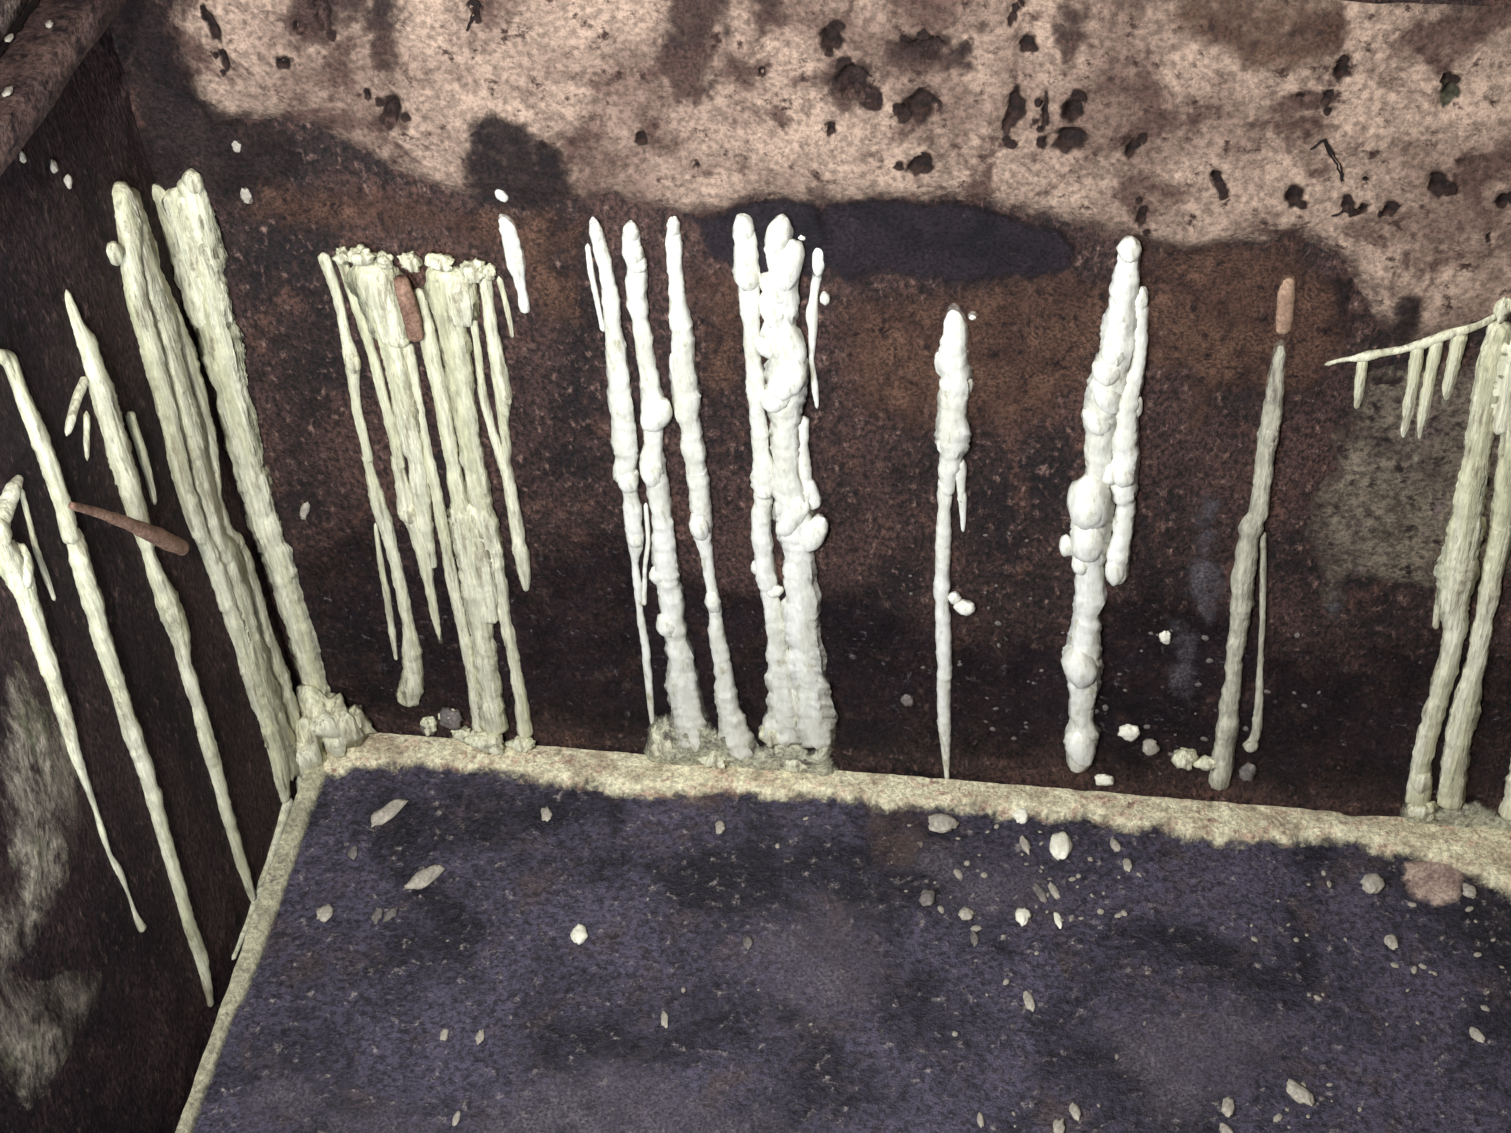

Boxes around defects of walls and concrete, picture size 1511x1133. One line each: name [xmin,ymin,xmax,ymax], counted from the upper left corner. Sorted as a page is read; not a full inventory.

water stain [0,349,214,1007]
water stain [65,289,150,524]
water stain [112,179,1511,1133]
corrosion [1141,245,1340,423]